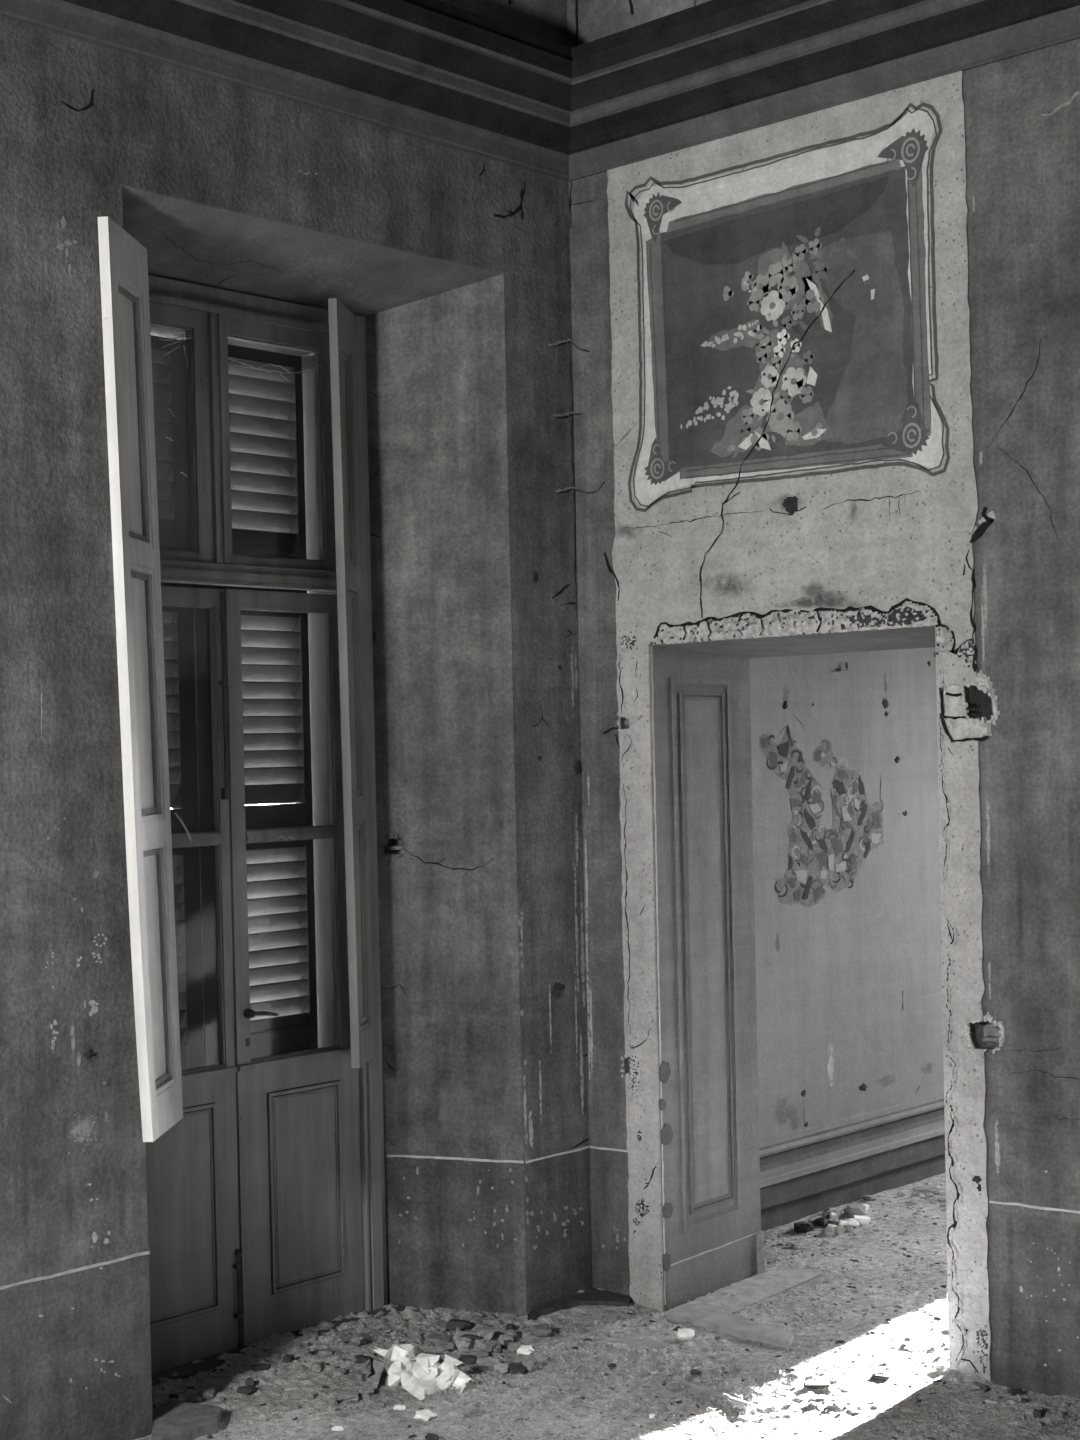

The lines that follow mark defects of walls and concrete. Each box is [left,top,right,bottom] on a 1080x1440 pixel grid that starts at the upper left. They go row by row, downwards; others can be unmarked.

crack [549,270,855,638]
crack [821,491,922,517]
crack [963,507,996,642]
flaking render [620,598,1000,739]
crack [915,666,988,1373]